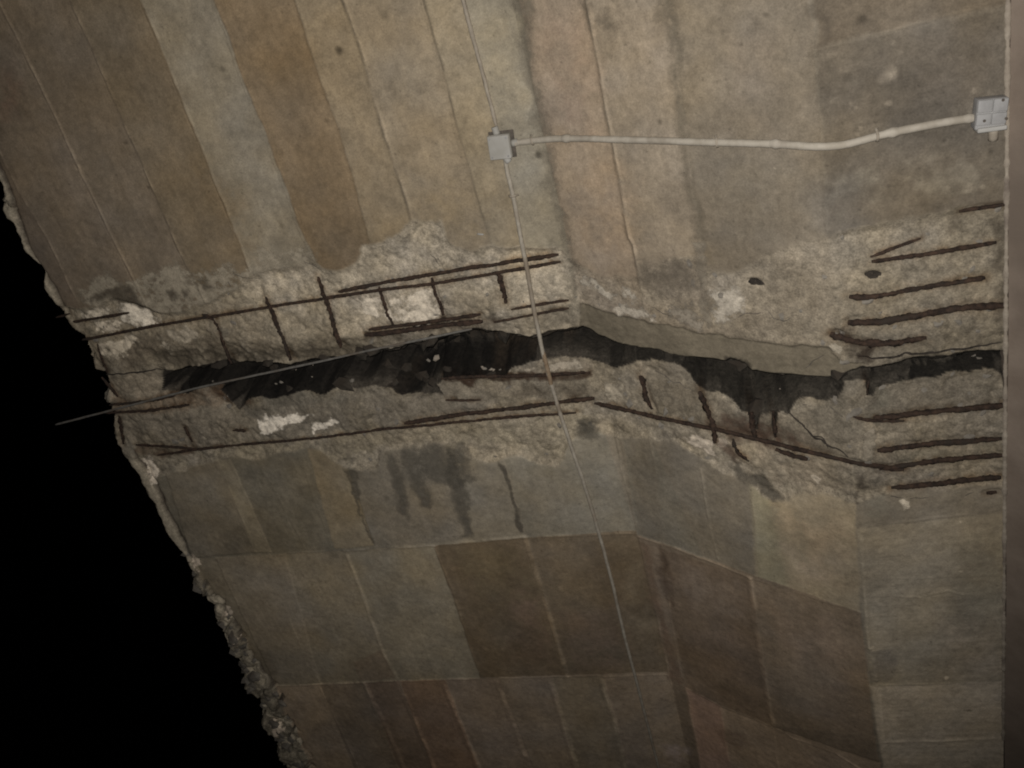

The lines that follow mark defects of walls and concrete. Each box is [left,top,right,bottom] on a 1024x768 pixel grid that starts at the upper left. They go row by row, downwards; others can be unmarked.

spalling [58,205,1005,504]
crack [106,325,1003,457]
water stain [388,444,471,536]